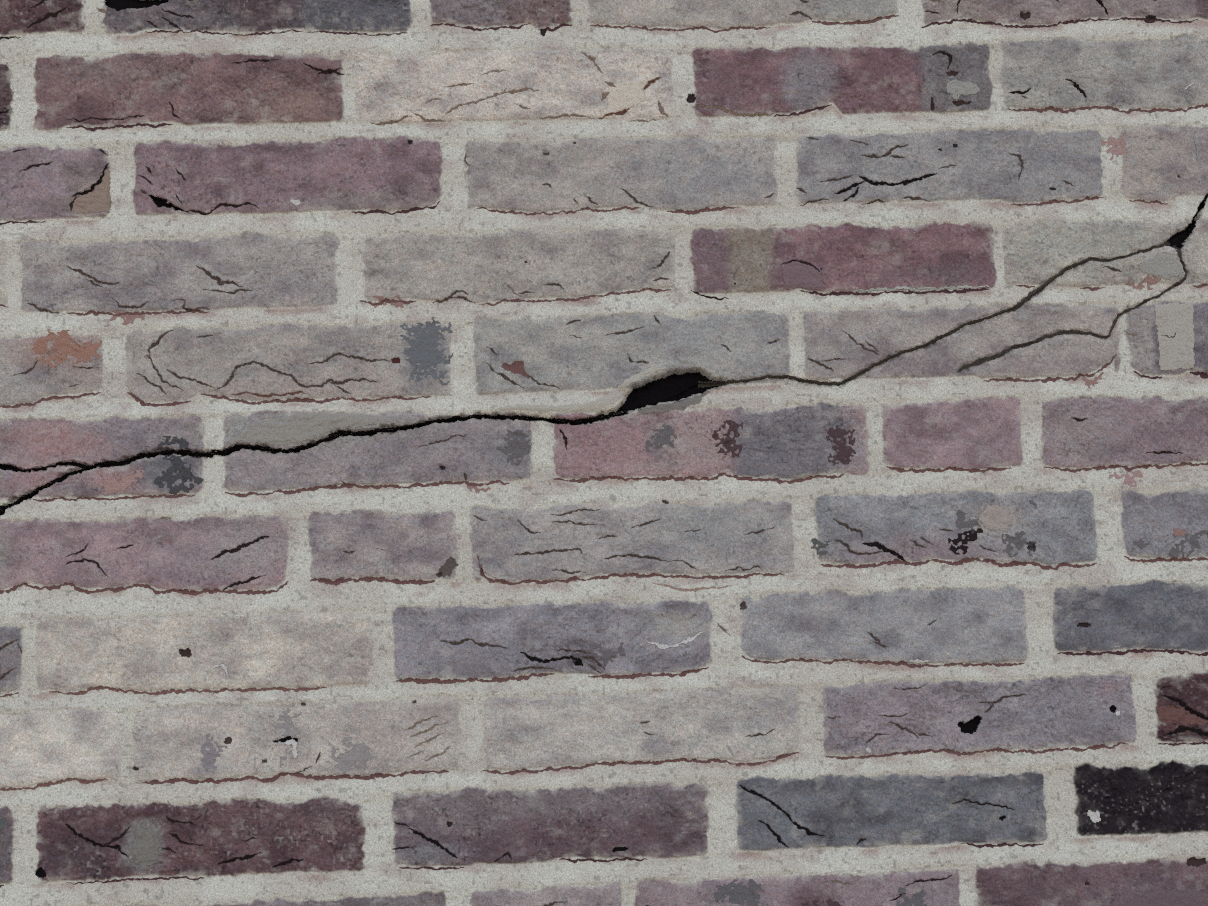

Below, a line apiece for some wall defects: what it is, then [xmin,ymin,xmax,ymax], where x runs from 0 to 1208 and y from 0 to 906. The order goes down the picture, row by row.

crack [0,102,180,225]
crack [360,251,728,363]
crack [698,193,1208,388]
crack [0,265,627,519]
crack [1044,451,1208,473]
crack [0,544,435,595]
crack [49,686,327,695]
crack [396,638,709,684]
crack [477,473,1128,849]
crack [0,778,107,791]
crack [143,715,451,785]
crack [65,815,303,884]